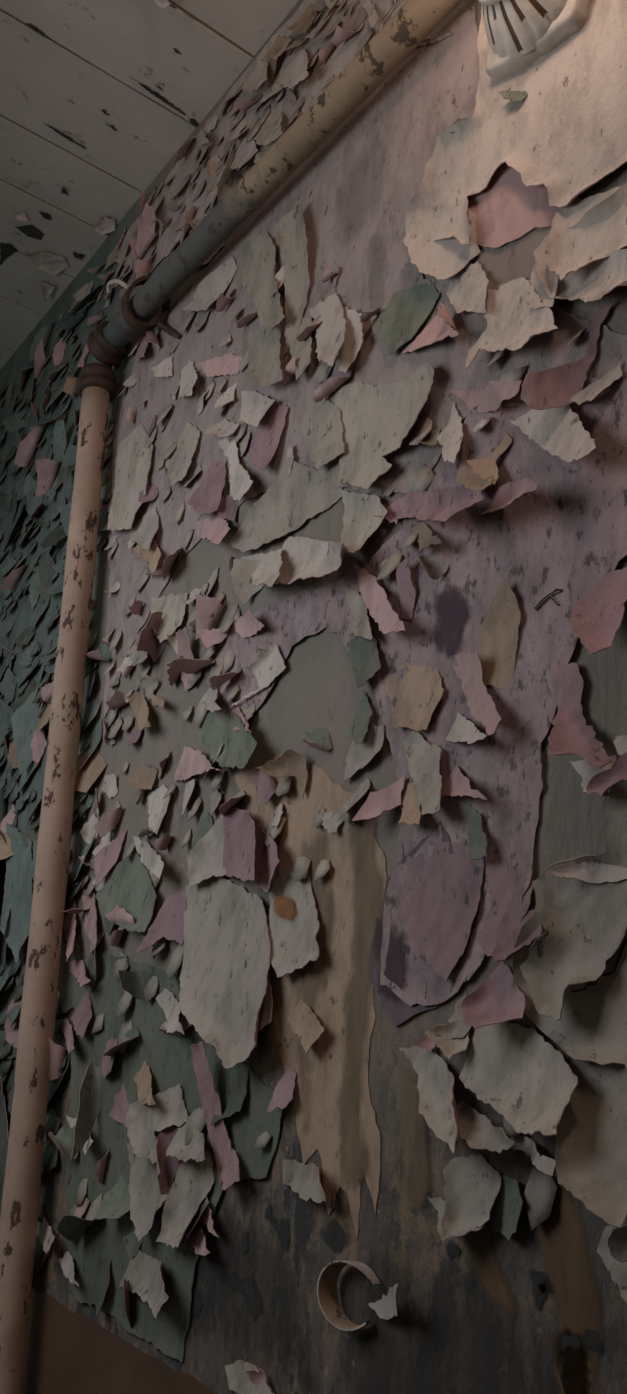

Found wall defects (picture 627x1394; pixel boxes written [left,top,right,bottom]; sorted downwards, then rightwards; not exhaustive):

flaking render [41,6,627,1176]
peeling [313,579,627,1303]
crack [570,941,627,993]
peeling [56,1041,251,1328]
peeling [282,1159,326,1203]
peeling [33,1203,55,1275]
flaking render [265,1204,290,1250]
peeling [317,1219,399,1331]
peeling [225,1360,274,1394]